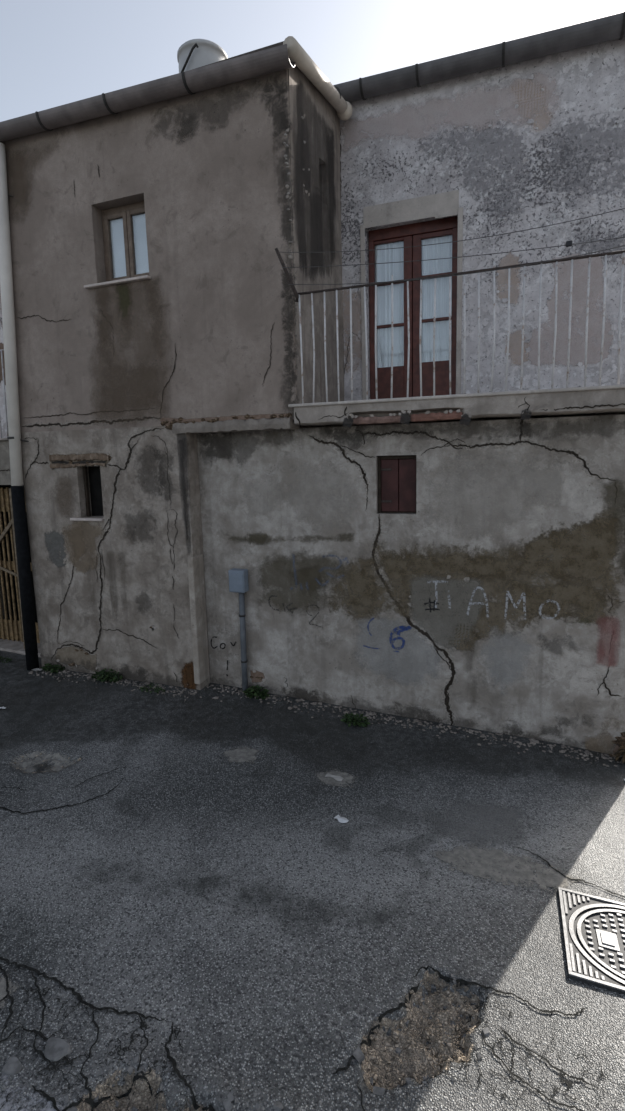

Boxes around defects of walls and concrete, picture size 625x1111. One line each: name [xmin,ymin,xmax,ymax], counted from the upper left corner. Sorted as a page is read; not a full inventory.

crack [0,348,178,659]
peeling [407,575,484,651]
crack [295,397,625,726]
crack [0,964,202,1111]
crack [445,989,625,1111]